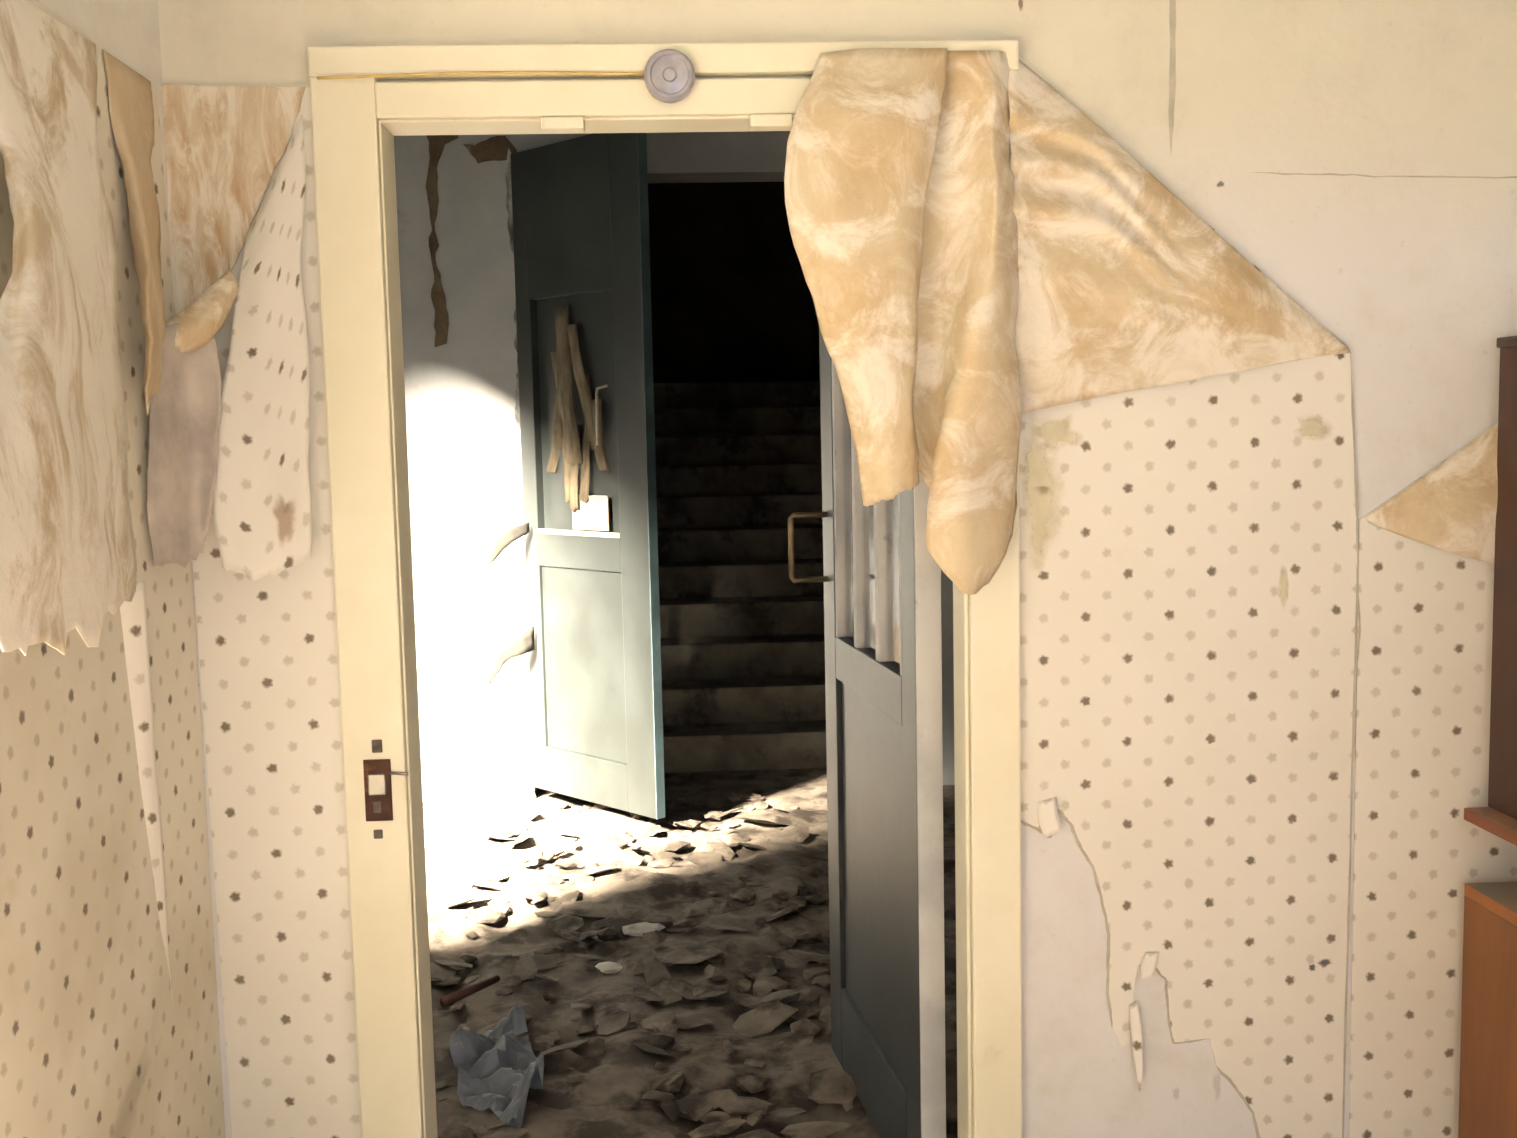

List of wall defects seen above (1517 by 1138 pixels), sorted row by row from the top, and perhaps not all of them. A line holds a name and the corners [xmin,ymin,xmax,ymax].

spalling [426,135,524,524]
spalling [521,653,537,799]
peeling [1129,1001,1143,1092]